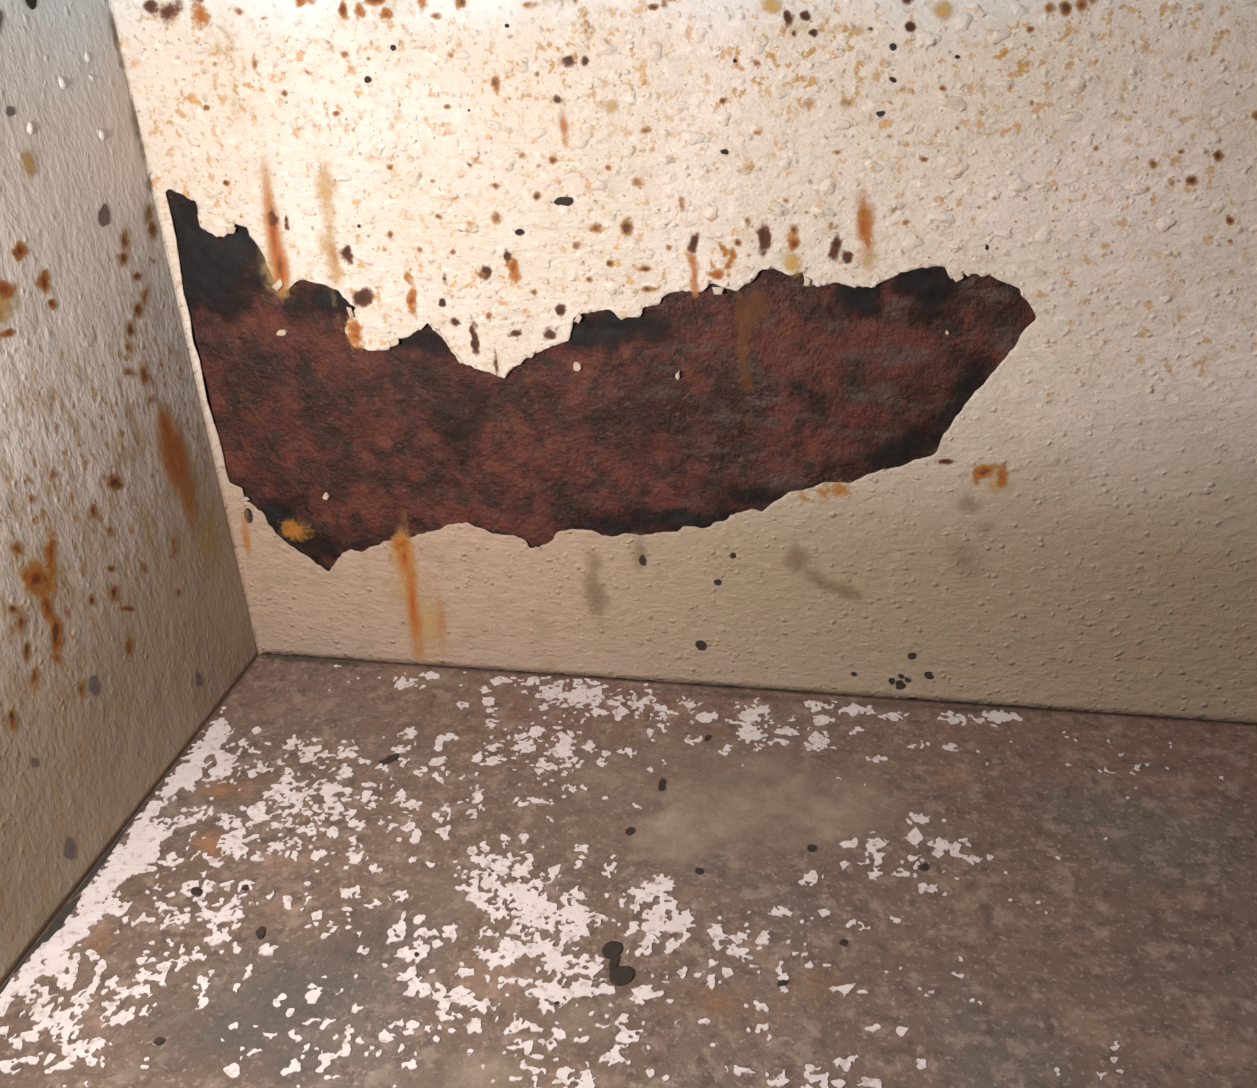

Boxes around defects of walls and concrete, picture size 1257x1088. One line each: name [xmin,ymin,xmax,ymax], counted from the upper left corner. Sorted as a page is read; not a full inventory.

rust [143,0,210,29]
rust [338,0,392,20]
rust [265,185,289,293]
rust [687,218,771,294]
rust [828,201,874,266]
rust [353,288,374,307]
rust [439,298,491,354]
peeling [166,189,1036,571]
leakage [633,757,889,859]
leakage [195,833,226,855]
leakage [192,980,326,1046]
leakage [452,1058,517,1086]